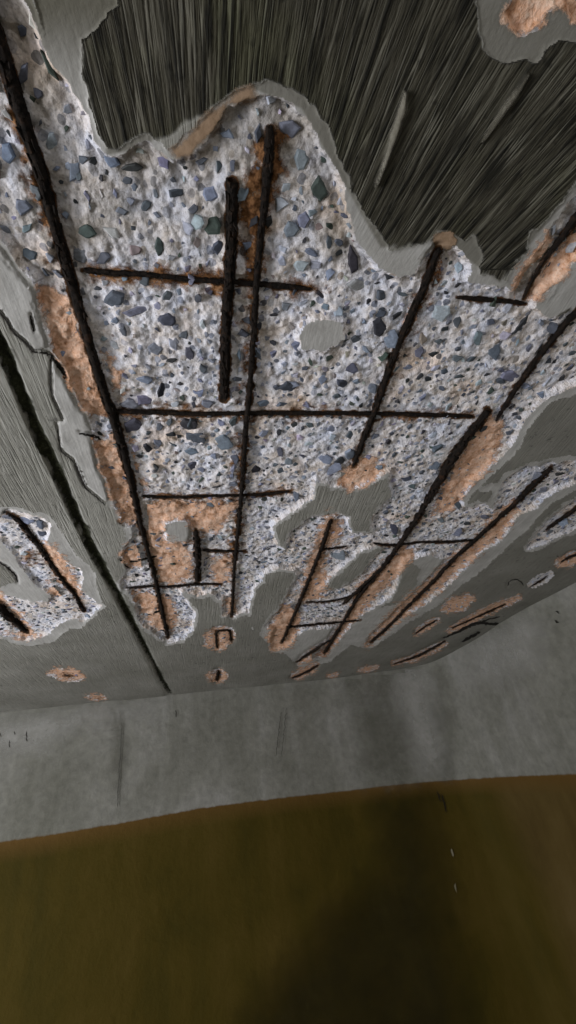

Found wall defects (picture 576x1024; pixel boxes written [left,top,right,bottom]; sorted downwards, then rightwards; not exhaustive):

corrosion [500,0,576,37]
corrosion [86,261,224,296]
corrosion [236,126,290,330]
corrosion [508,229,576,302]
spalling [0,0,576,679]
corrosion [35,284,294,632]
corrosion [431,409,505,520]
corrosion [46,665,87,682]
corrosion [205,667,228,685]
corrosion [202,626,235,653]
corrosion [291,545,414,680]
corrosion [357,498,522,673]